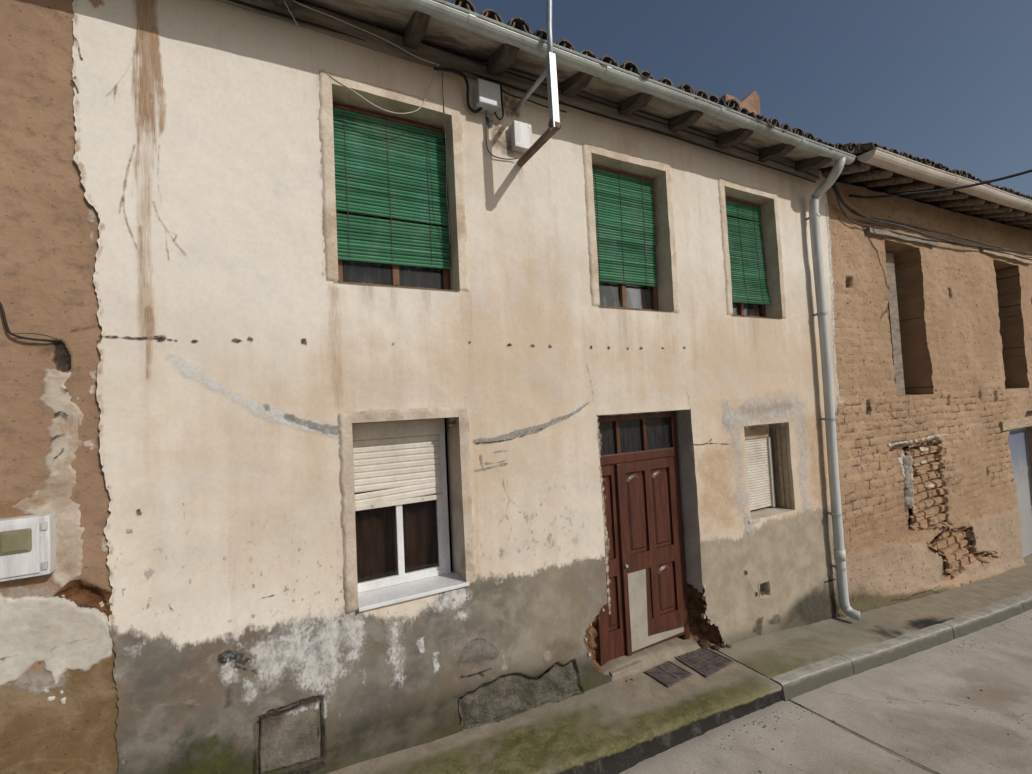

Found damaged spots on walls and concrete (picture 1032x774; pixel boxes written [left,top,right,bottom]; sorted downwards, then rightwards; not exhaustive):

crack [99,335,339,437]
peeling [0,363,116,705]
spalling [584,417,611,676]
flaking render [889,434,1001,577]
peeling [221,612,365,718]
peeling [387,617,407,683]
peeling [416,637,439,673]
spalling [459,659,585,730]
spalling [687,583,726,651]